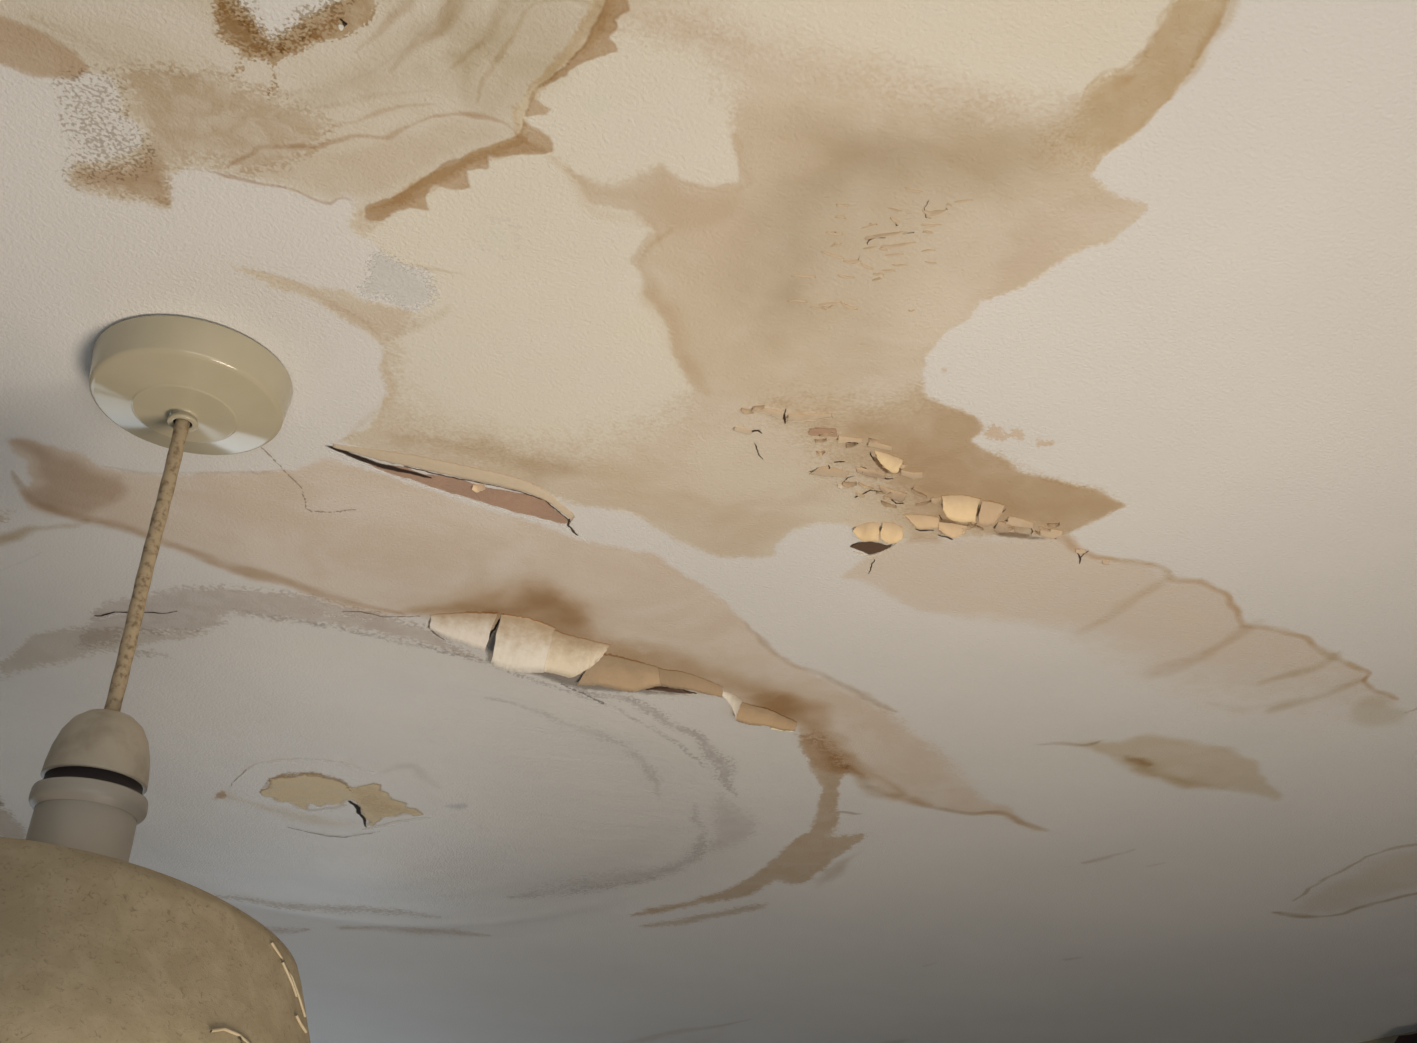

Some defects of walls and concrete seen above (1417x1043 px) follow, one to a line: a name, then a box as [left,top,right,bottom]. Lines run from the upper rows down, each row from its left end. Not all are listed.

crack [261,447,351,513]
crack [328,443,587,542]
peeling [733,405,1063,574]
peeling [260,762,424,838]